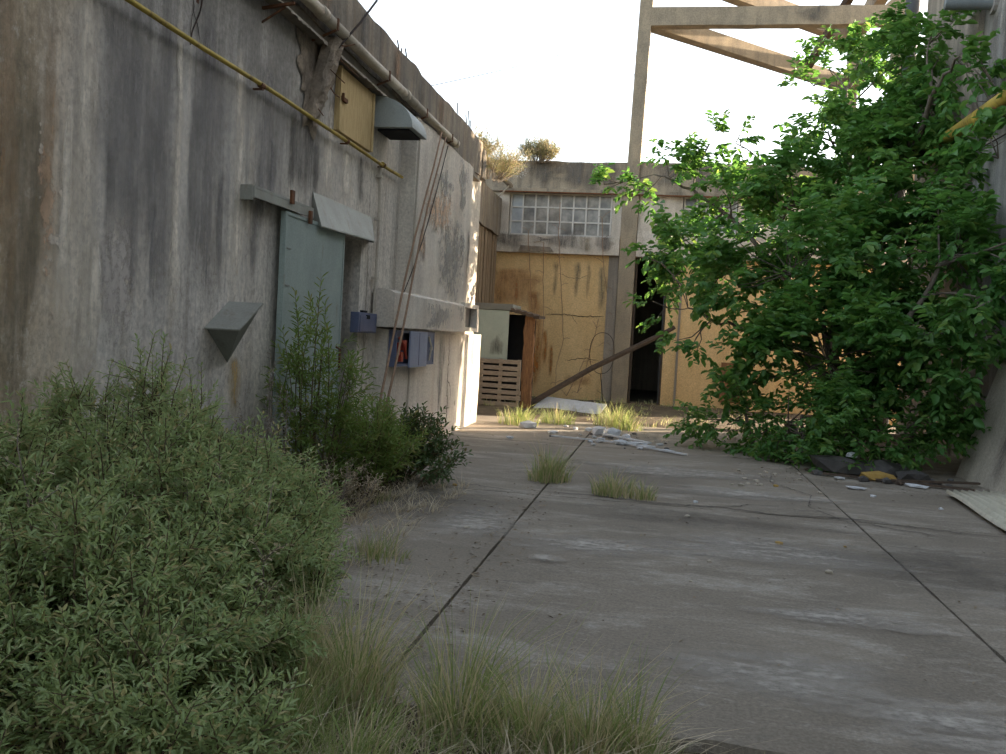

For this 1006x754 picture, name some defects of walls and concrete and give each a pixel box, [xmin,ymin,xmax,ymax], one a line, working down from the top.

peeling [38,122,62,287]
water stain [109,17,223,288]
water stain [235,58,275,269]
spalling [297,26,345,140]
spalling [339,0,378,77]